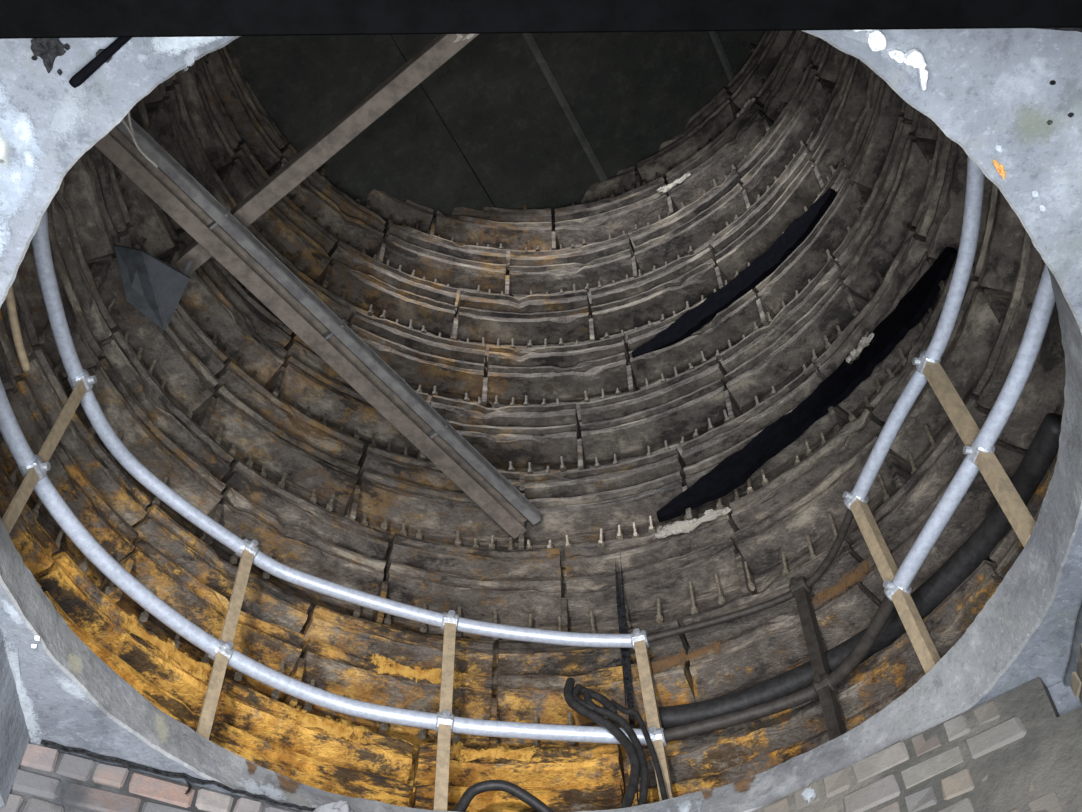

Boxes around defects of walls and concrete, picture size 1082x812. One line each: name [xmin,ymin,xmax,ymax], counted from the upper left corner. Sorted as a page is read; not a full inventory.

peeling [841,30,928,91]
leakage [50,94,88,148]
leakage [0,83,46,256]
crack [40,740,314,812]